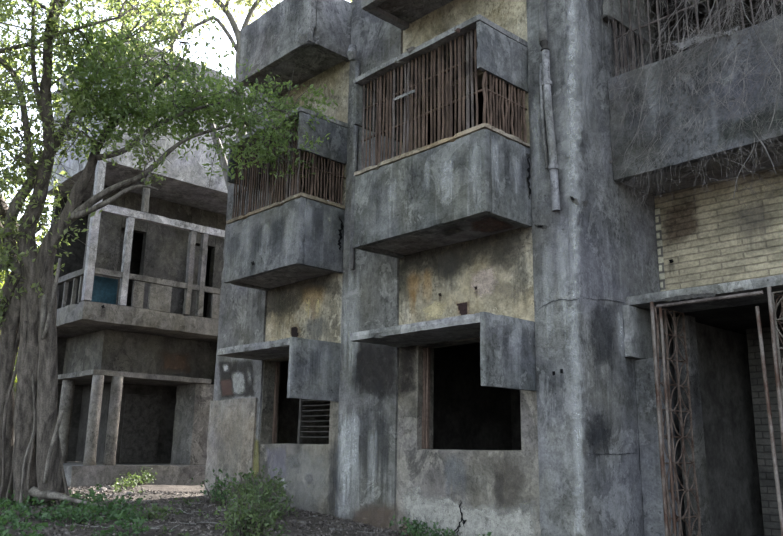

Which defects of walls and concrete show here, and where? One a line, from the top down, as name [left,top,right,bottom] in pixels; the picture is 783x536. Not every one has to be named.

water stain [354,343,416,398]
water stain [329,439,340,509]